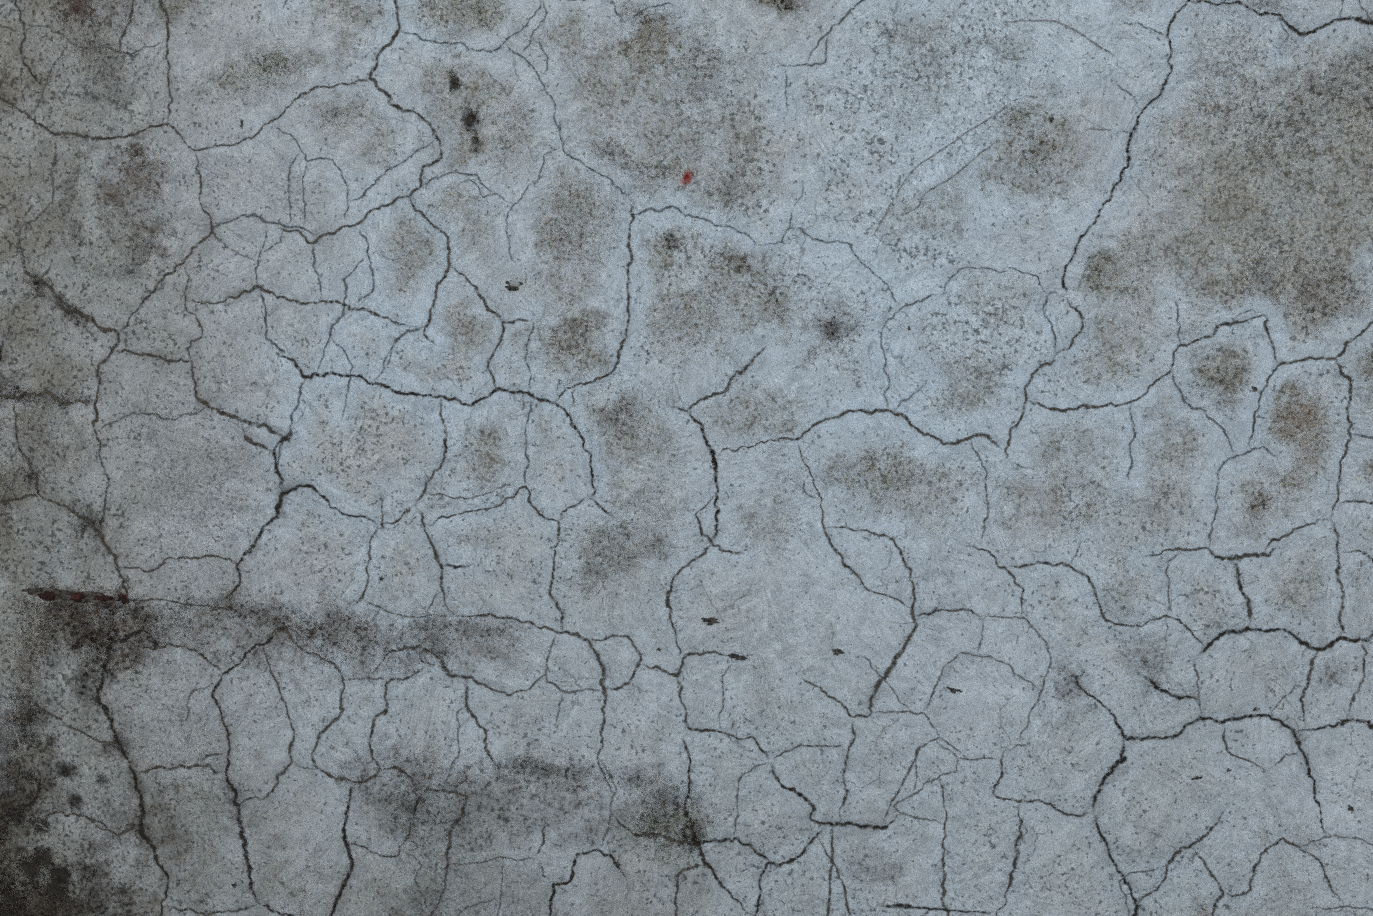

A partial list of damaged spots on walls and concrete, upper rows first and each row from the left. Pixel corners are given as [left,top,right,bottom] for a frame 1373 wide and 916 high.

crack [782,0,864,105]
crack [944,0,1373,350]
crack [0,0,755,623]
crack [1,228,1373,916]
water stain [57,762,75,777]
water stain [69,794,84,810]
water stain [0,809,124,916]